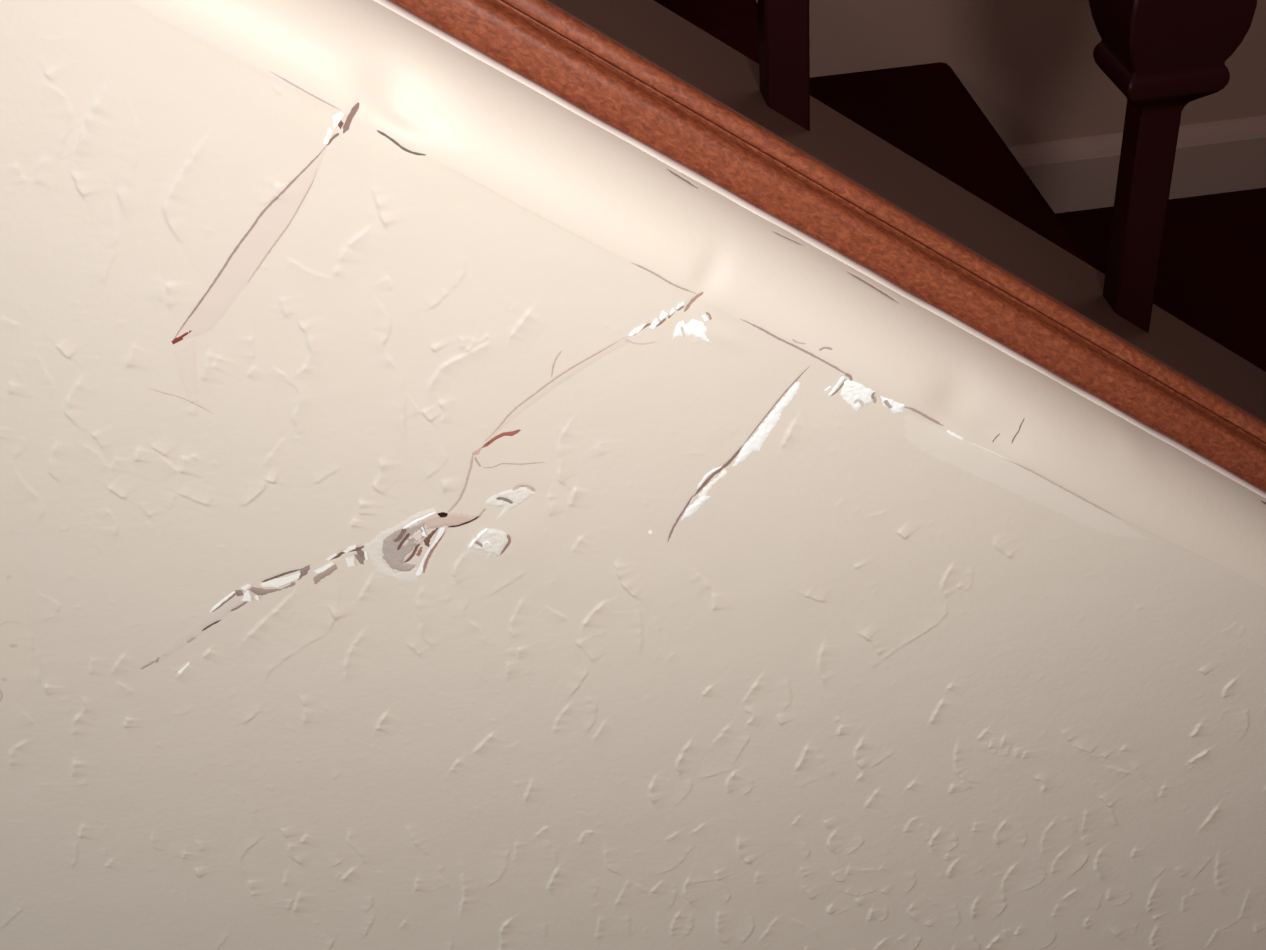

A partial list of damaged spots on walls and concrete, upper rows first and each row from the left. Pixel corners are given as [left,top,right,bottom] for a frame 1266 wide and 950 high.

crack [173,71,944,573]
crack [187,569,300,643]
peeling [235,545,368,601]
peeling [416,527,445,575]